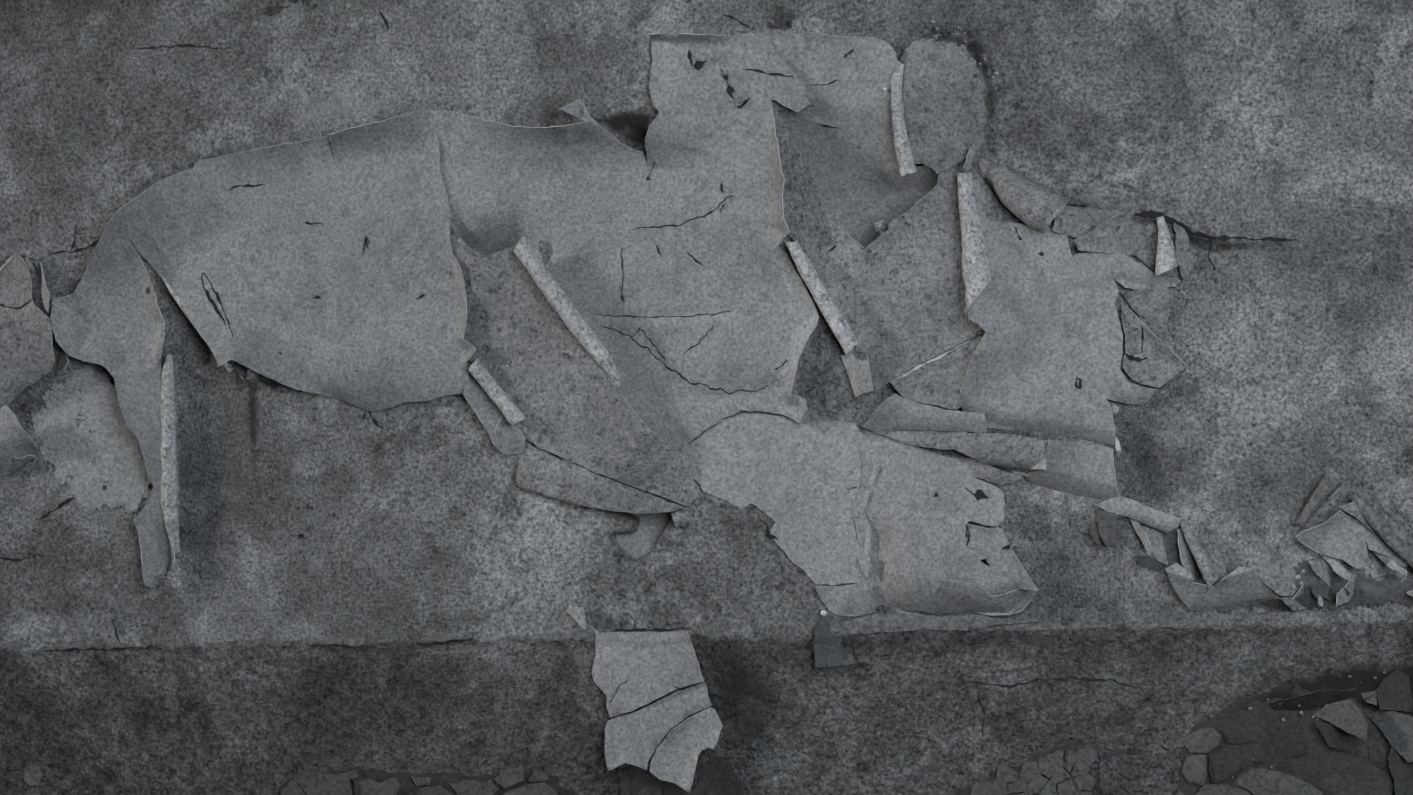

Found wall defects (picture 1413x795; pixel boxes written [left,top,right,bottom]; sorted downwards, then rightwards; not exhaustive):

spalling [767,6,795,31]
peeling [0,30,1413,617]
peeling [567,603,743,795]
peeling [813,596,1054,668]